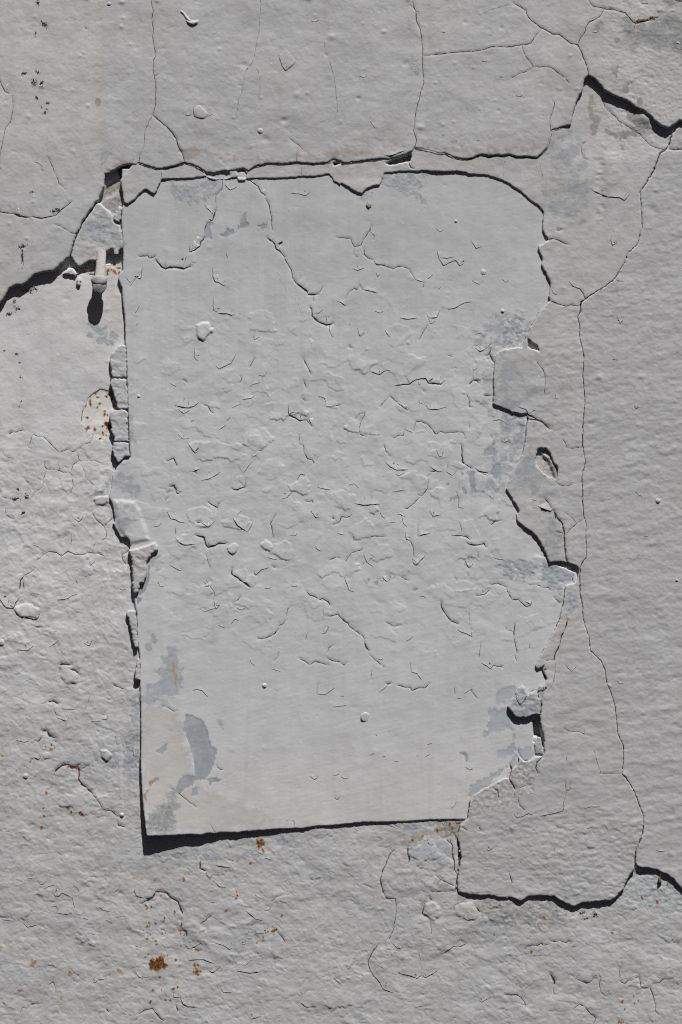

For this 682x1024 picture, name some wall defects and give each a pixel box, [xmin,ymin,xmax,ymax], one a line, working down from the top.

crack [0,160,95,253]
crack [139,1,384,337]
crack [409,2,652,177]
crack [603,103,682,196]
peeling [82,389,116,442]
rust [85,392,117,440]
peeling [356,313,538,508]
peeling [154,485,237,612]
crack [441,238,644,896]
peeling [144,714,222,835]
spalling [385,686,540,870]
rust [143,910,185,1003]